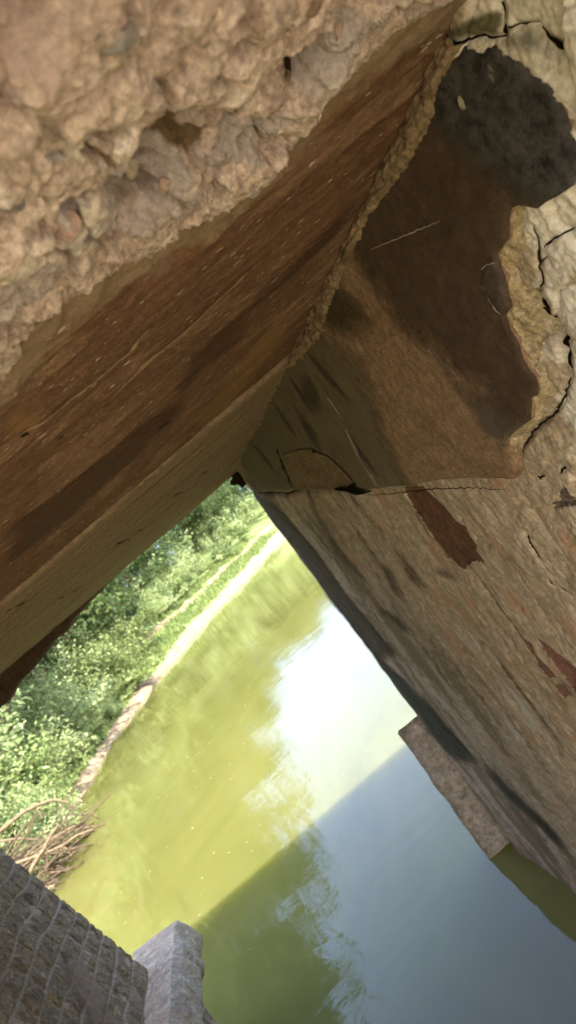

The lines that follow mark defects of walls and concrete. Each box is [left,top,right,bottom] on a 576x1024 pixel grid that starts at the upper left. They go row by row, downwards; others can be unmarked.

crack [447,1,565,50]
spalling [501,206,560,468]
crack [522,227,575,452]
crack [260,447,299,494]
crack [366,486,507,496]